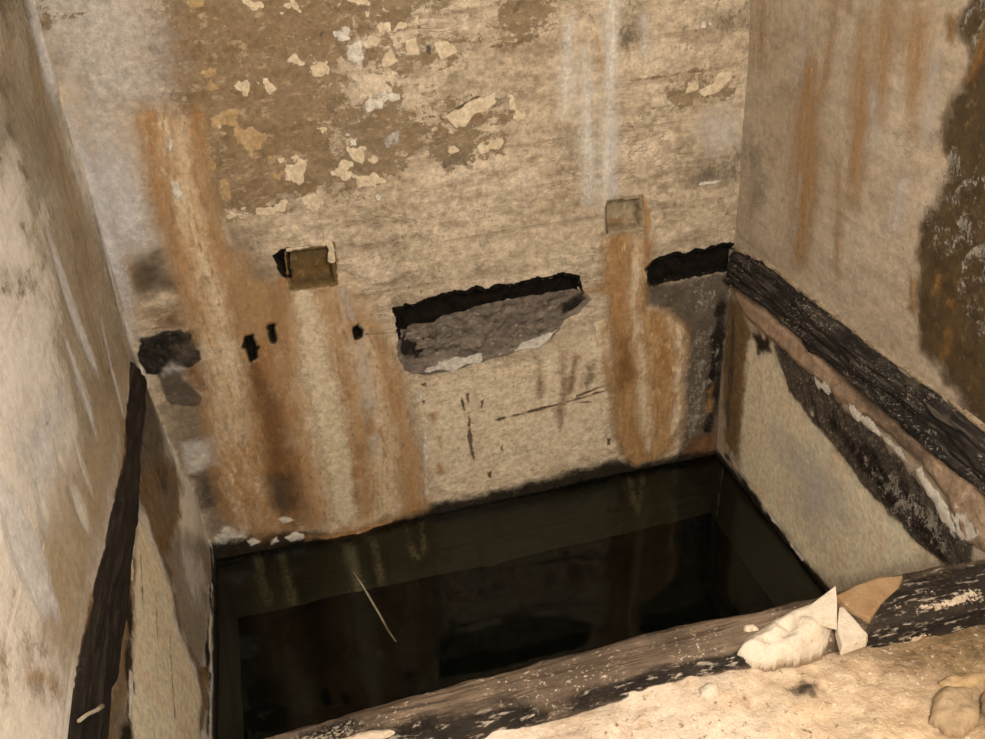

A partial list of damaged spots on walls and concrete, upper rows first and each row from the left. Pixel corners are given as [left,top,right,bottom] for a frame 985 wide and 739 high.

rust [137,109,301,536]
peeling [322,0,526,200]
spalling [392,272,619,505]
peeling [486,0,568,52]
peeling [637,68,736,110]
spalling [644,242,734,287]
rust [792,67,825,258]
damp [909,0,985,424]